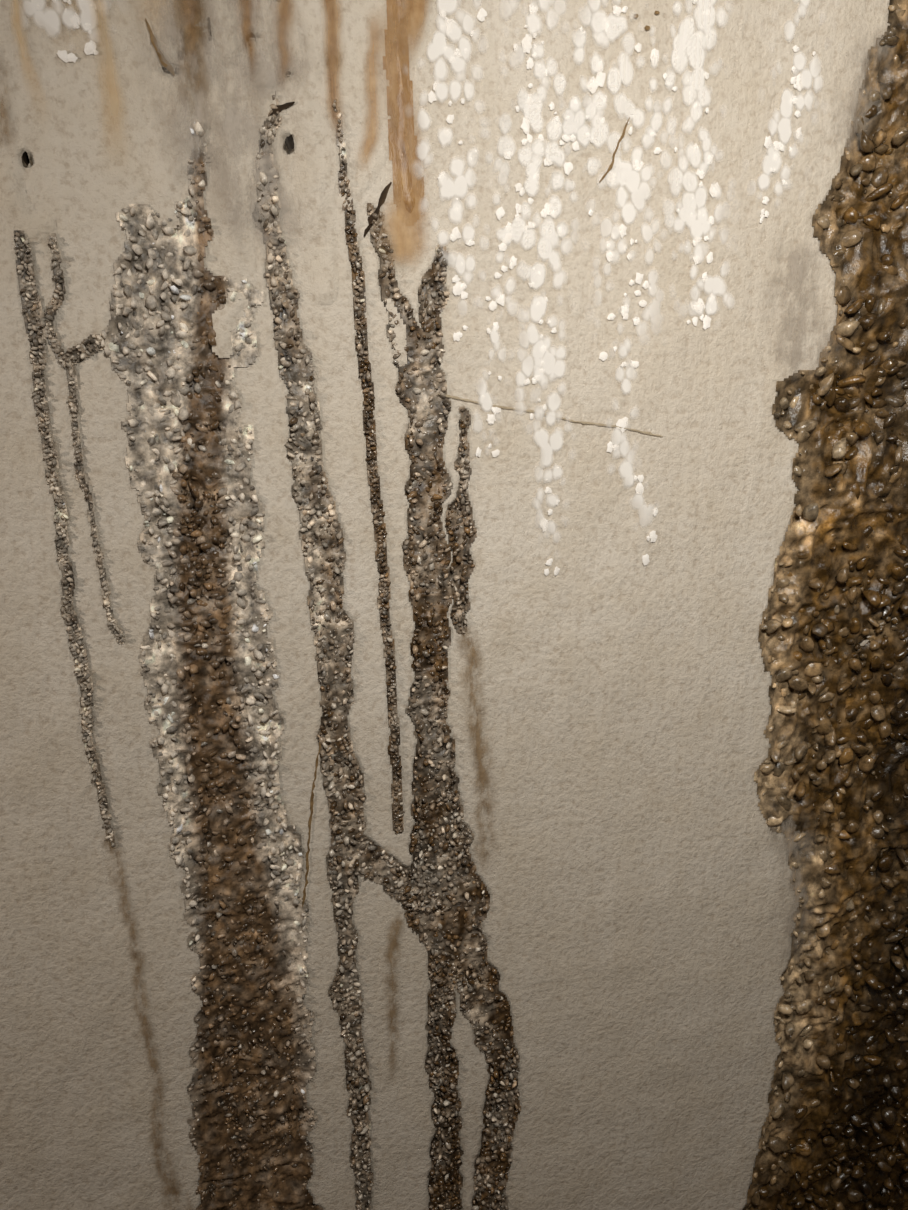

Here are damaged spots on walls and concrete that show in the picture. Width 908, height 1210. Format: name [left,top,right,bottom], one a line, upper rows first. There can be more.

efflorescence [23,0,107,63]
rust [193,161,213,235]
leakage [162,0,287,223]
efflorescence [418,0,732,539]
efflorescence [758,0,822,223]
rust [256,0,521,1210]
efflorescence [544,558,560,576]
efflorescence [606,405,658,565]
rust [167,253,316,1210]
leakage [463,635,490,841]
leakage [387,920,401,1056]